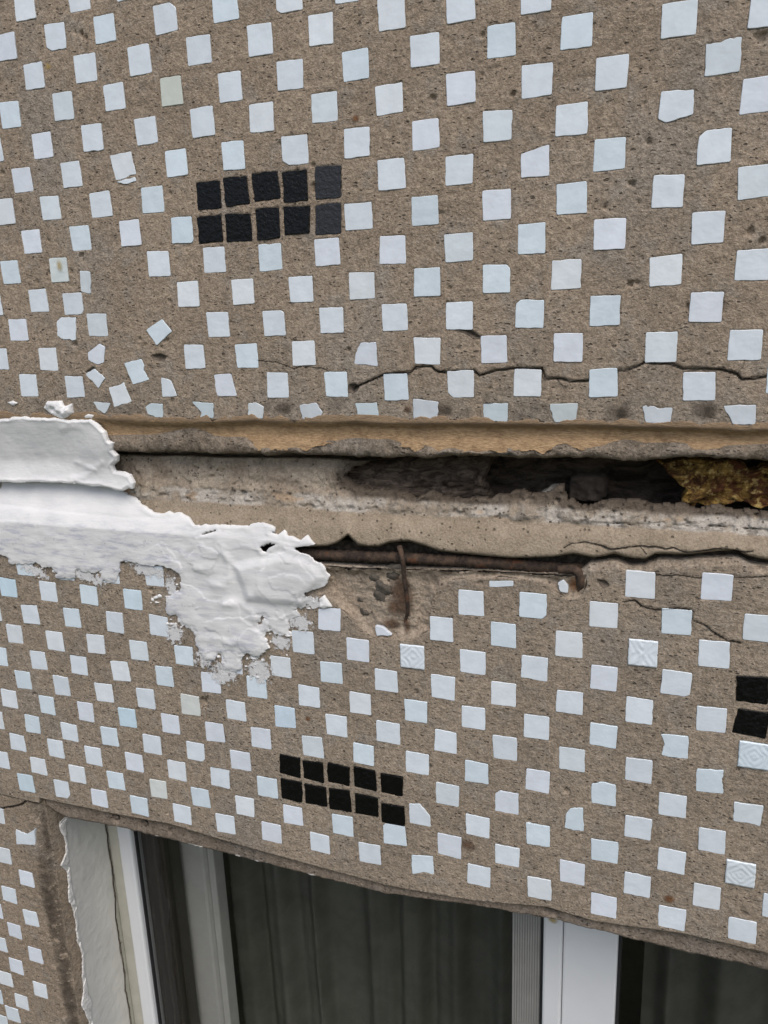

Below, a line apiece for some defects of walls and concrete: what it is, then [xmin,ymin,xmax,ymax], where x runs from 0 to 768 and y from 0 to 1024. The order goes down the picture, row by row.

spalling [57,317,77,340]
spalling [85,319,177,417]
crack [353,365,582,388]
spalling [108,370,768,508]
spalling [724,501,768,511]
corrosion [385,580,409,631]
spalling [295,545,609,640]
crack [624,600,741,644]